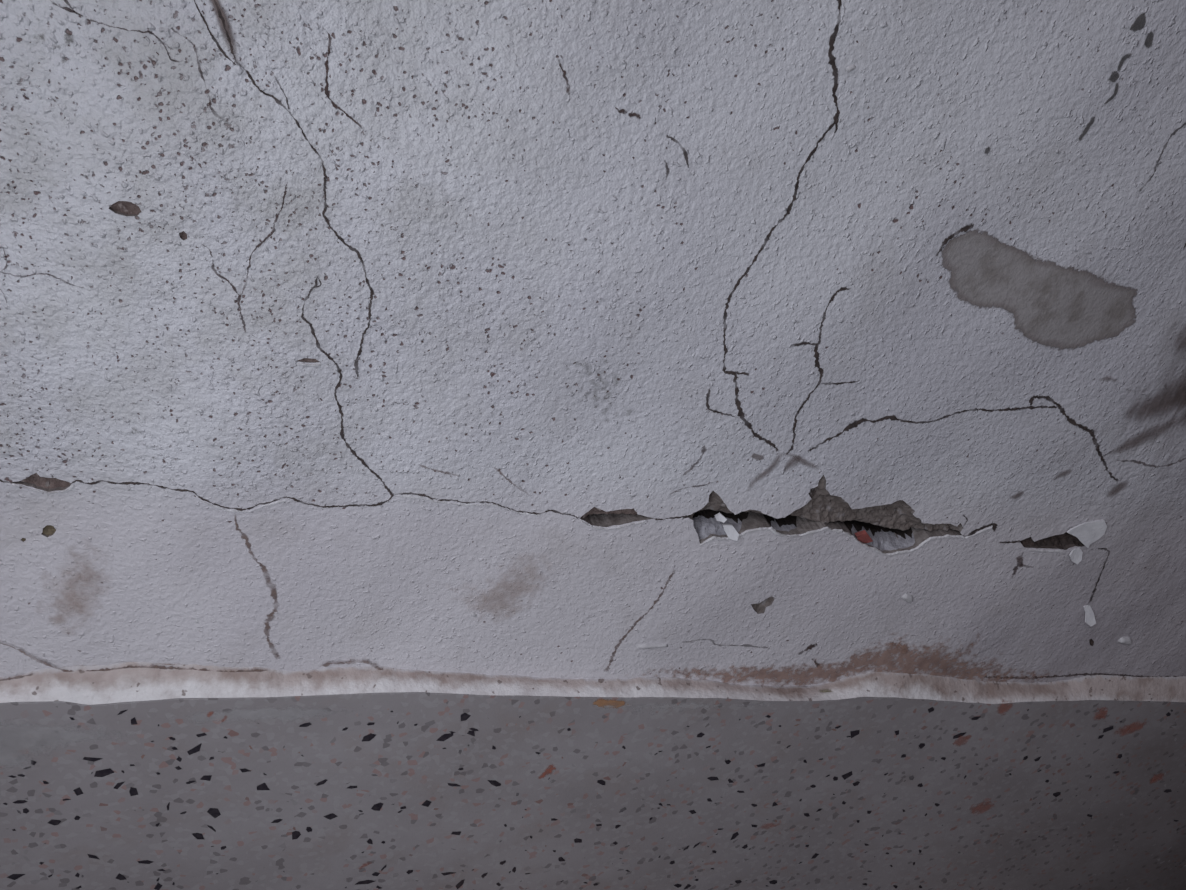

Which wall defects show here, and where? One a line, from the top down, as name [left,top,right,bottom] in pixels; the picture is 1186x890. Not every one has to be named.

crack [615,107,641,119]
crack [664,135,689,176]
crack [706,0,1179,481]
crack [0,0,578,681]
leakage [1119,423,1172,450]
spalling [10,473,74,493]
spalling [580,507,654,530]
spalling [683,475,965,556]
crack [963,515,1025,575]
spalling [1020,520,1107,564]
crack [606,573,674,670]
corrosion [674,643,1043,686]